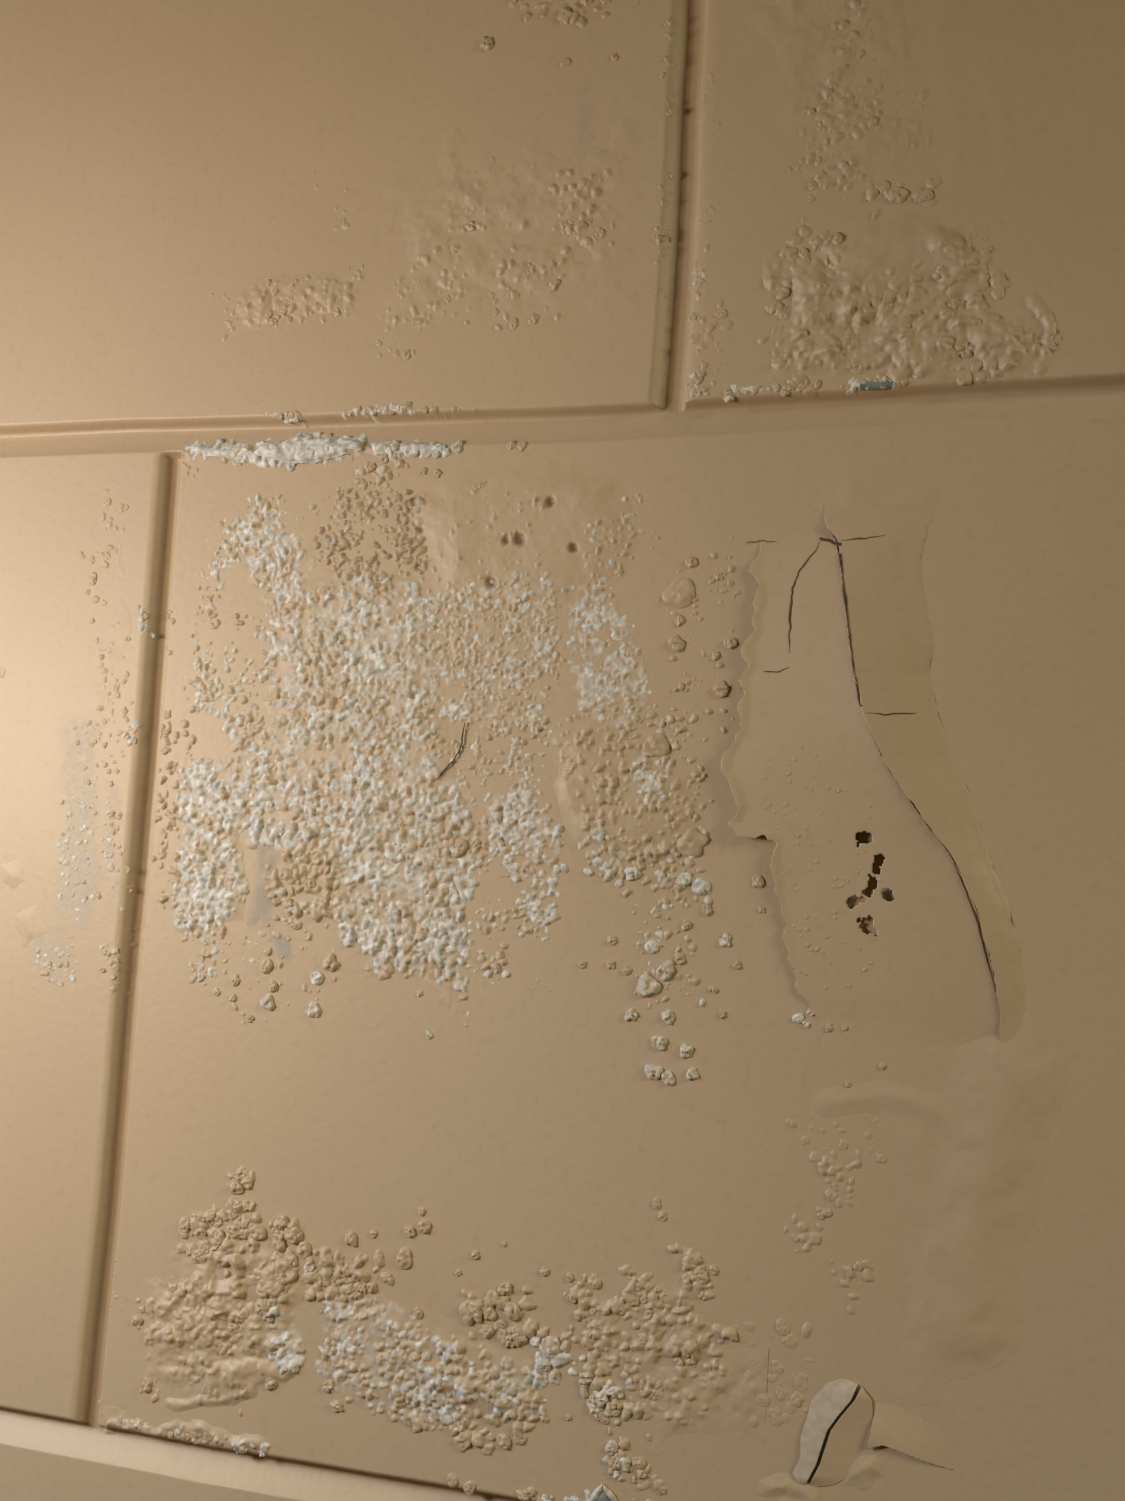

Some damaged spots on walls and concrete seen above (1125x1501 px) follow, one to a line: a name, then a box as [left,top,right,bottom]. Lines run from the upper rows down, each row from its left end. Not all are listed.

efflorescence [151,432,741,1086]
peeling [721,500,1026,1070]
peeling [516,1483,617,1501]
peeling [756,1379,955,1501]